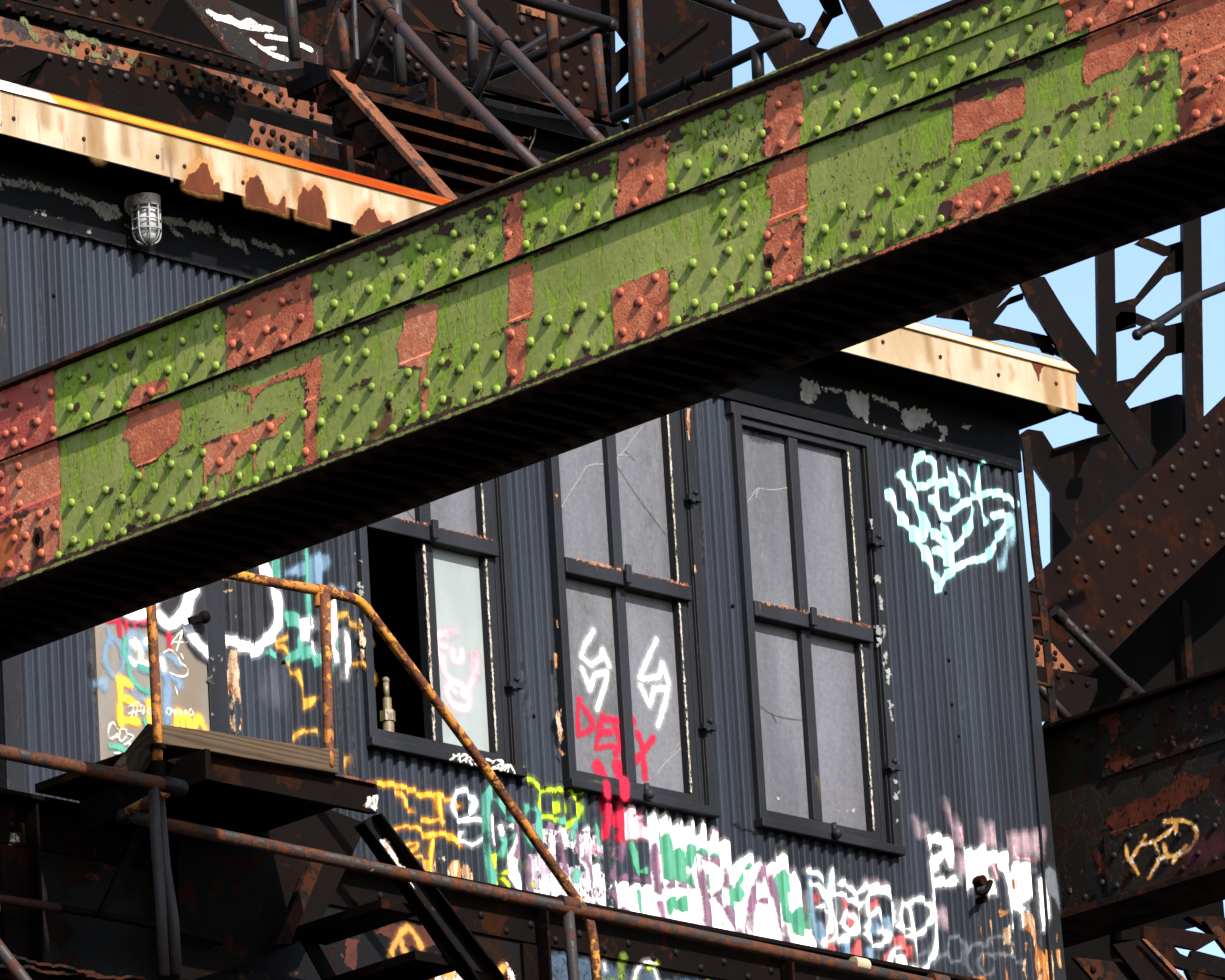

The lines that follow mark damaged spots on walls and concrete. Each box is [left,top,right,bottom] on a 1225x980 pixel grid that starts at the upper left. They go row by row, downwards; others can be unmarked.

peeling [0,175,131,230]
rust [170,151,221,196]
rust [245,172,328,225]
rust [354,205,394,234]
peeling [218,0,1007,314]
rust [1030,360,1044,381]
peeling [0,213,915,584]
peeling [800,377,971,442]
peeling [873,625,892,685]
peeling [206,645,242,733]
rust [556,710,564,755]
rust [375,923,436,948]